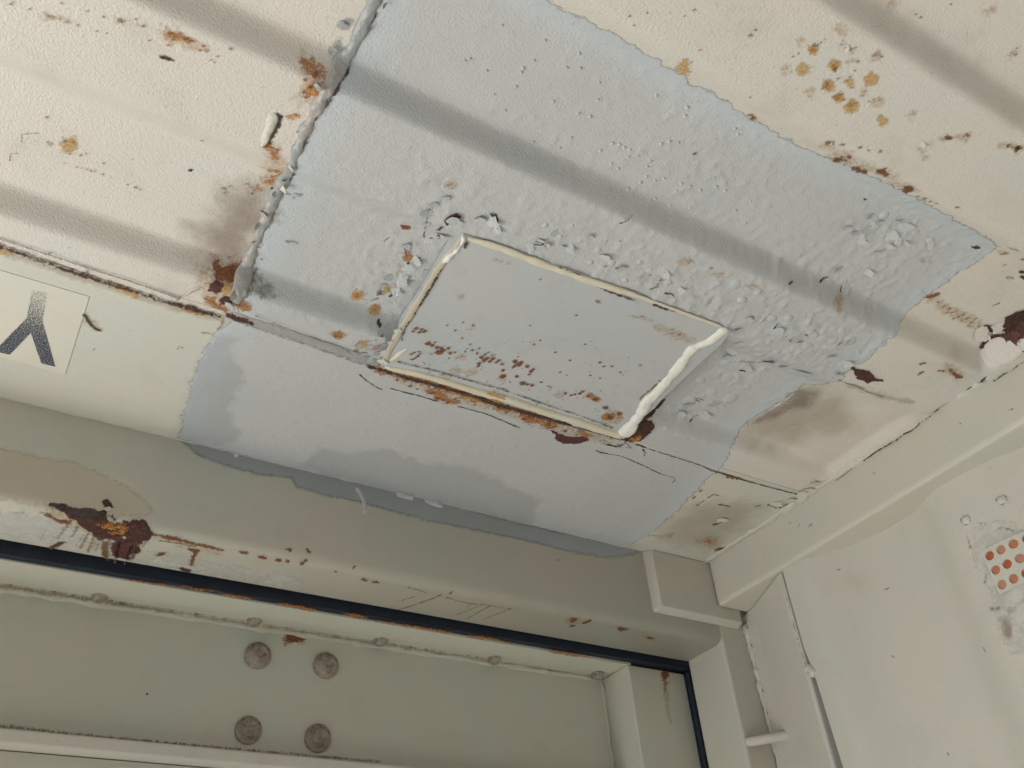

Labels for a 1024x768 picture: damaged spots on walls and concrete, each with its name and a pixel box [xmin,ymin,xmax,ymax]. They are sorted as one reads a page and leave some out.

corrosion [299,57,326,98]
corrosion [822,40,883,114]
peeling [260,112,283,148]
peeling [400,197,502,240]
corrosion [0,239,592,440]
peeling [975,310,1024,369]
peeling [550,430,589,444]
crack [359,267,797,525]
corrosion [561,362,626,420]
peeling [621,399,665,443]
peeling [851,366,883,383]
corrosion [44,499,250,600]